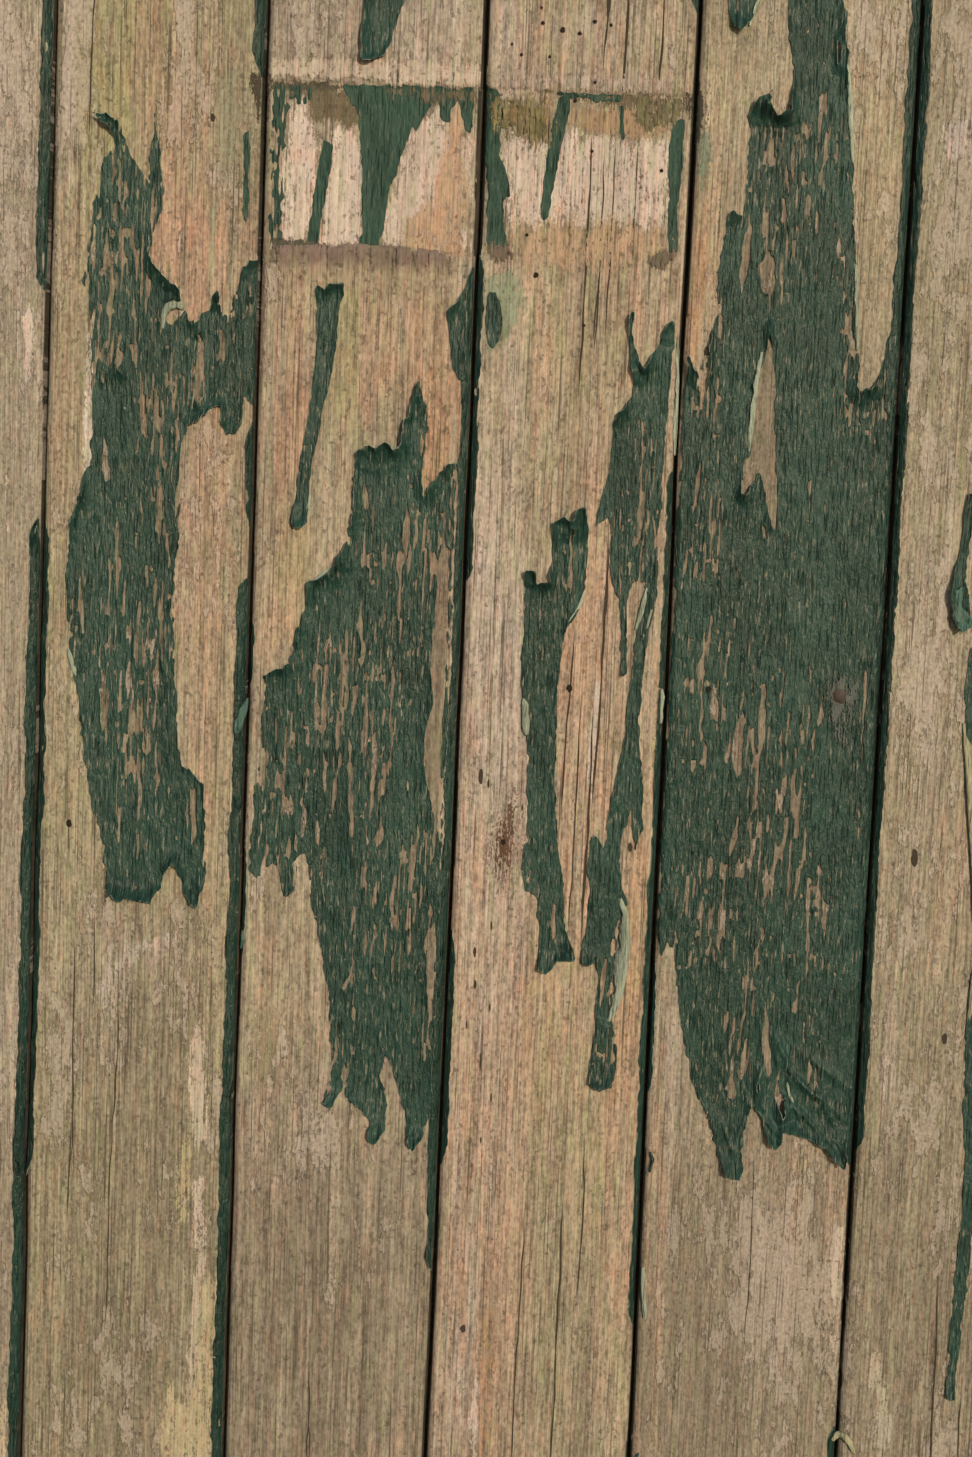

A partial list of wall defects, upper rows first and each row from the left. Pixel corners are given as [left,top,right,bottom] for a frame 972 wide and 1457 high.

peeling [360,0,406,60]
peeling [65,112,264,909]
peeling [291,283,344,528]
peeling [249,381,457,1151]
peeling [521,0,897,1181]
peeling [951,493,972,878]
peeling [946,975,972,1401]